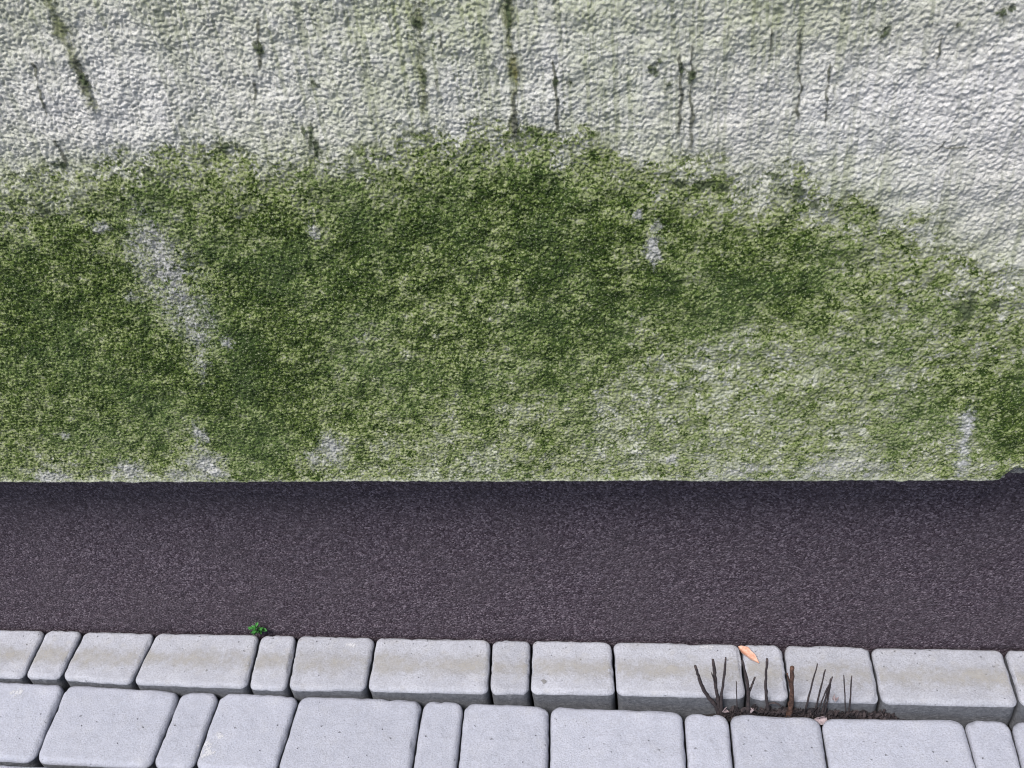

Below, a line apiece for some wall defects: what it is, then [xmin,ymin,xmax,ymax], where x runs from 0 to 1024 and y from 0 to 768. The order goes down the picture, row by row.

damp [677,46,696,149]
damp [957,413,975,476]